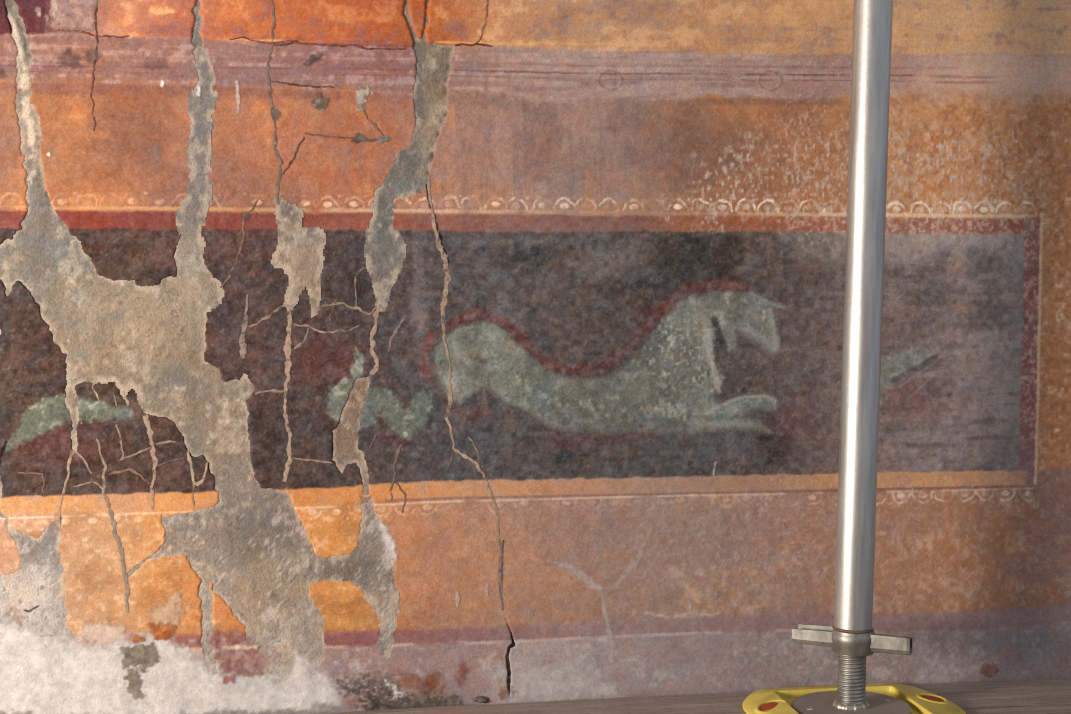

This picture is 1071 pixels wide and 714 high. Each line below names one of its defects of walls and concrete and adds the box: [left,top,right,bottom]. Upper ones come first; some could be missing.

spalling [0,0,400,684]
damp [0,593,462,714]
crack [220,0,406,482]
damp [379,524,397,559]
spalling [364,0,453,312]
crack [425,176,515,695]